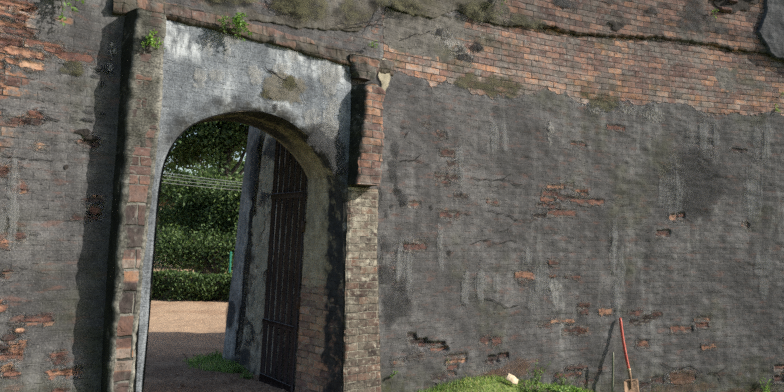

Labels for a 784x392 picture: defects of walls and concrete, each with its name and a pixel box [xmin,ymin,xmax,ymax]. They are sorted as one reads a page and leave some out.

flaking render [0,0,96,89]
peeling [383,6,784,116]
flaking render [6,107,44,127]
water stain [670,148,724,222]
flaking render [0,299,56,379]
flaking render [406,331,470,383]